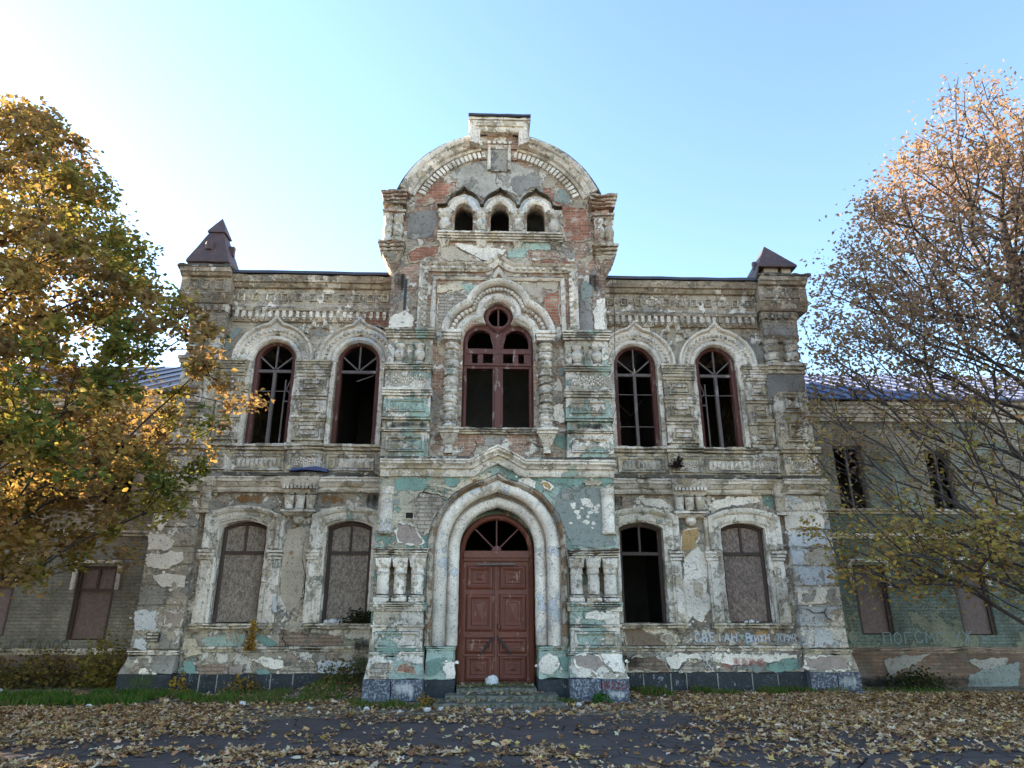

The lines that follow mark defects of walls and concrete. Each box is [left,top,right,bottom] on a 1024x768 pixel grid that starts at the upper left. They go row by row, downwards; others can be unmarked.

flaking render [394,477,462,546]
peeling [540,478,613,529]
peeling [145,512,188,591]
peeling [680,528,711,626]
flaking render [130,609,459,679]
peeling [535,627,850,679]